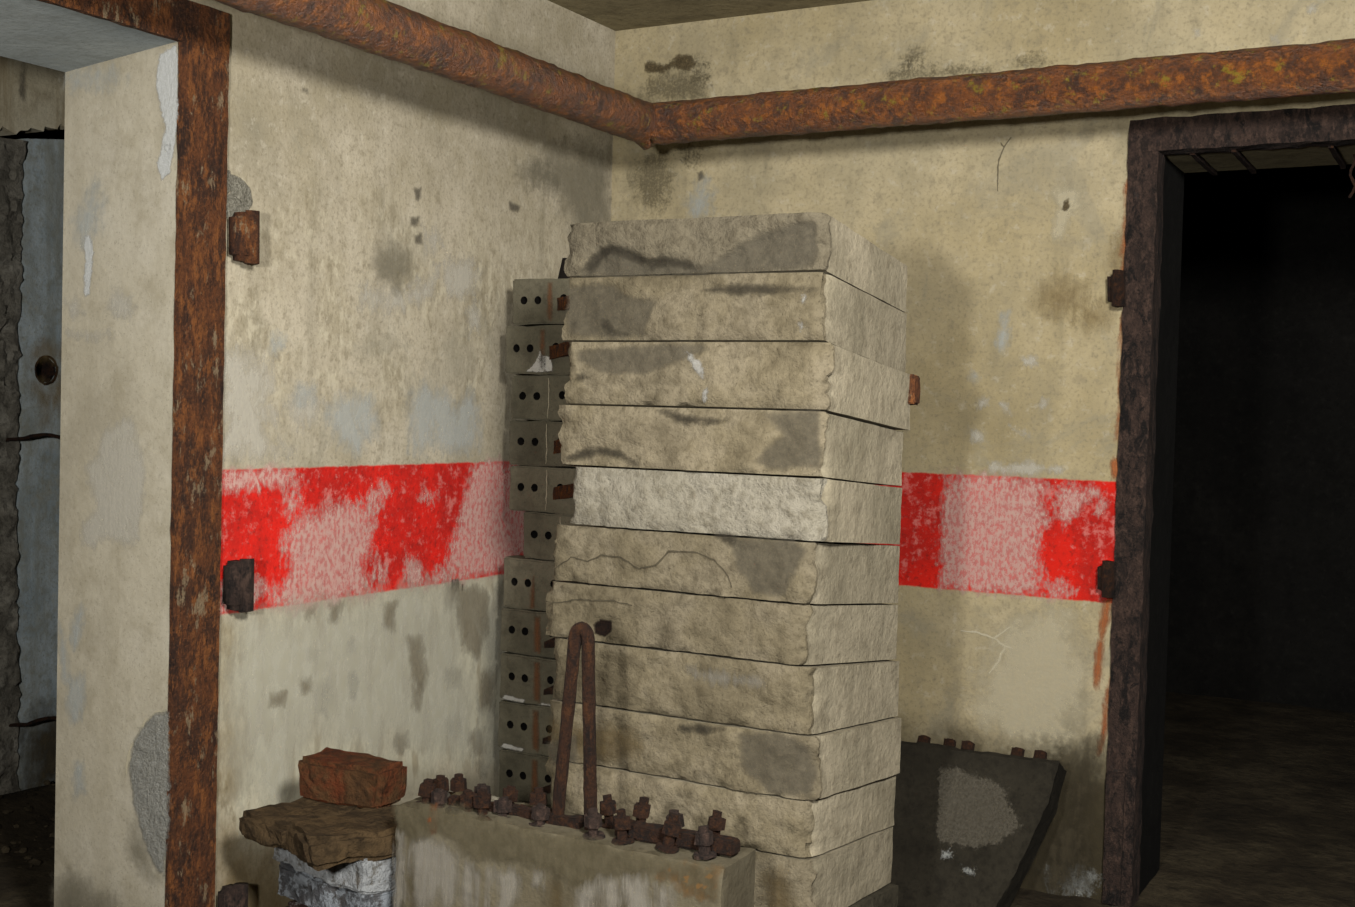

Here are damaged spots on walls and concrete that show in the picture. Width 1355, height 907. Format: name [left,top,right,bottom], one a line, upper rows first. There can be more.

spalling [0,137,60,795]
corrosion [1094,599,1111,753]
flaking render [129,711,171,872]
water stain [394,805,715,907]